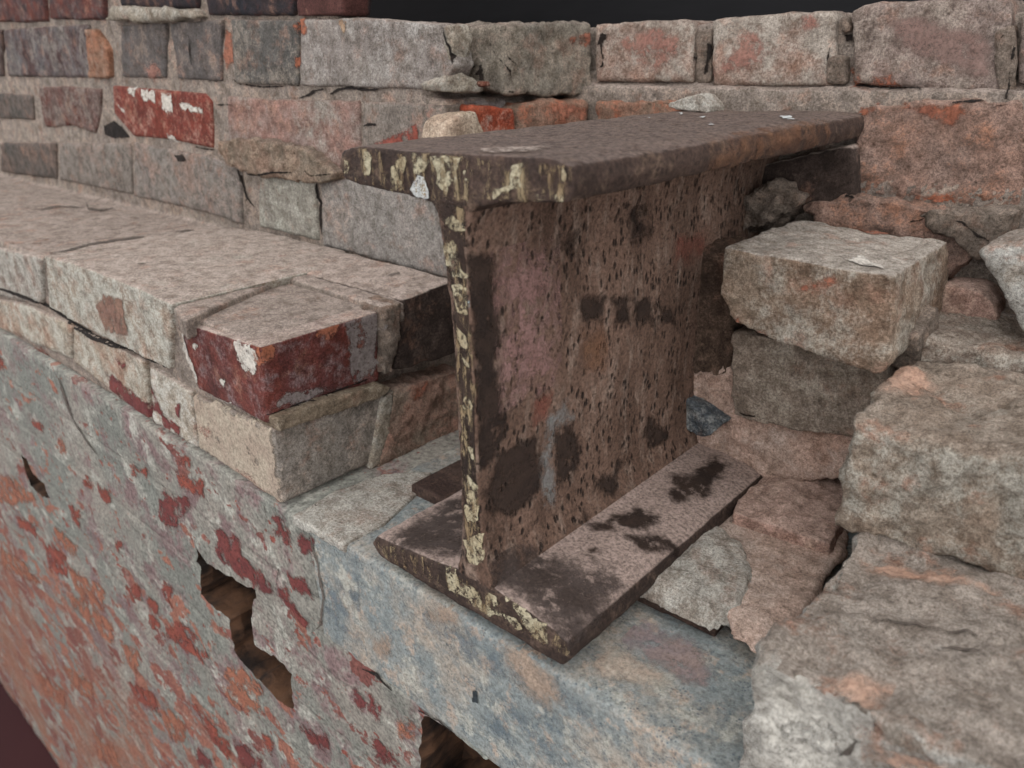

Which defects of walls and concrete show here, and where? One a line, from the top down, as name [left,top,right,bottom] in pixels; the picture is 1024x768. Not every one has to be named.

crack [443,31,457,65]
crack [237,171,330,234]
crack [0,288,167,368]
peeling [316,313,387,382]
peeling [344,124,572,565]
corrosion [392,202,582,561]
corrosion [669,456,726,502]
peeling [0,474,186,742]
peeling [215,528,313,628]
peeling [382,546,570,656]
corrosion [491,546,623,654]
corrosion [585,508,679,557]